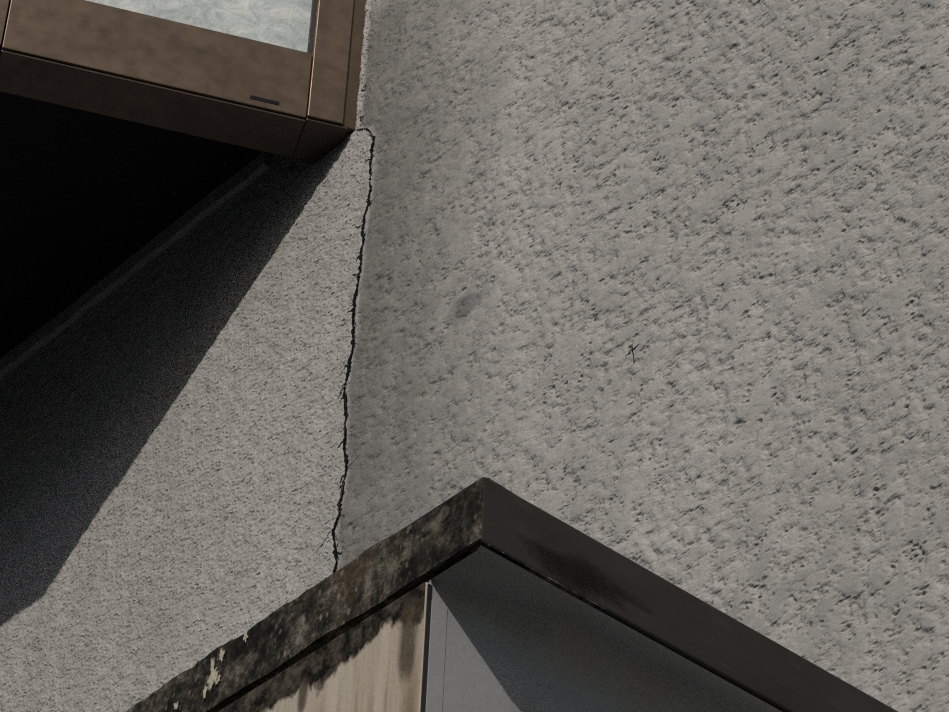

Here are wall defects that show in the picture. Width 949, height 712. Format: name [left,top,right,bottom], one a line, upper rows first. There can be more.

crack [315,127,375,573]
leakage [218,582,425,712]